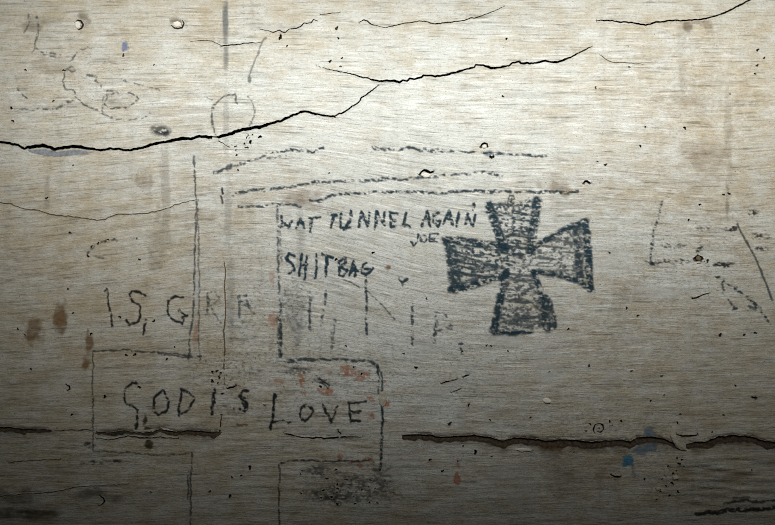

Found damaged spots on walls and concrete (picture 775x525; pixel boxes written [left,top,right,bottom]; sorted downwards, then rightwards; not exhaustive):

crack [0,45,644,157]